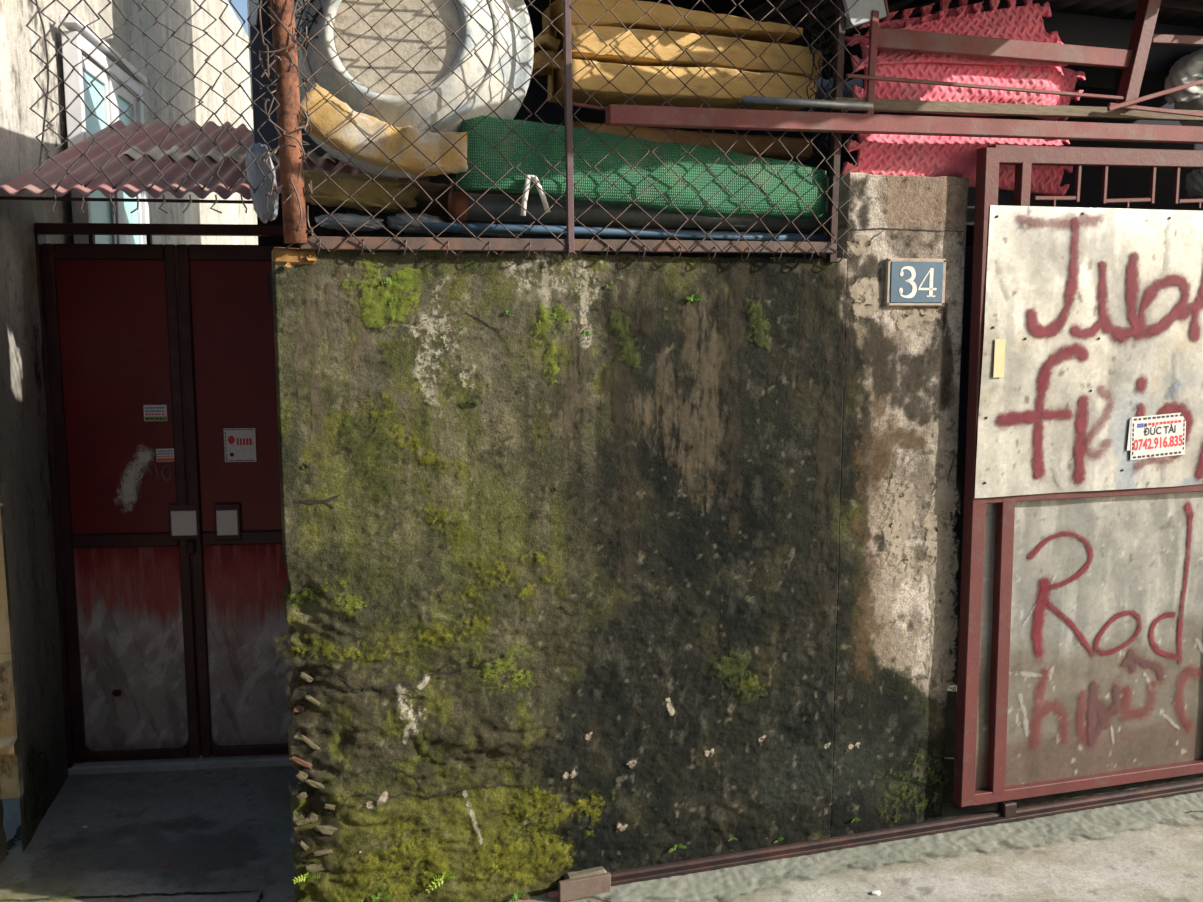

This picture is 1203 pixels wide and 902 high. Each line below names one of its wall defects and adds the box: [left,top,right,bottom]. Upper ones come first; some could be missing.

leakage [411,277,476,405]
leakage [507,252,764,624]
leakage [796,178,954,674]
leakage [397,675,430,744]
leakage [463,791,483,845]